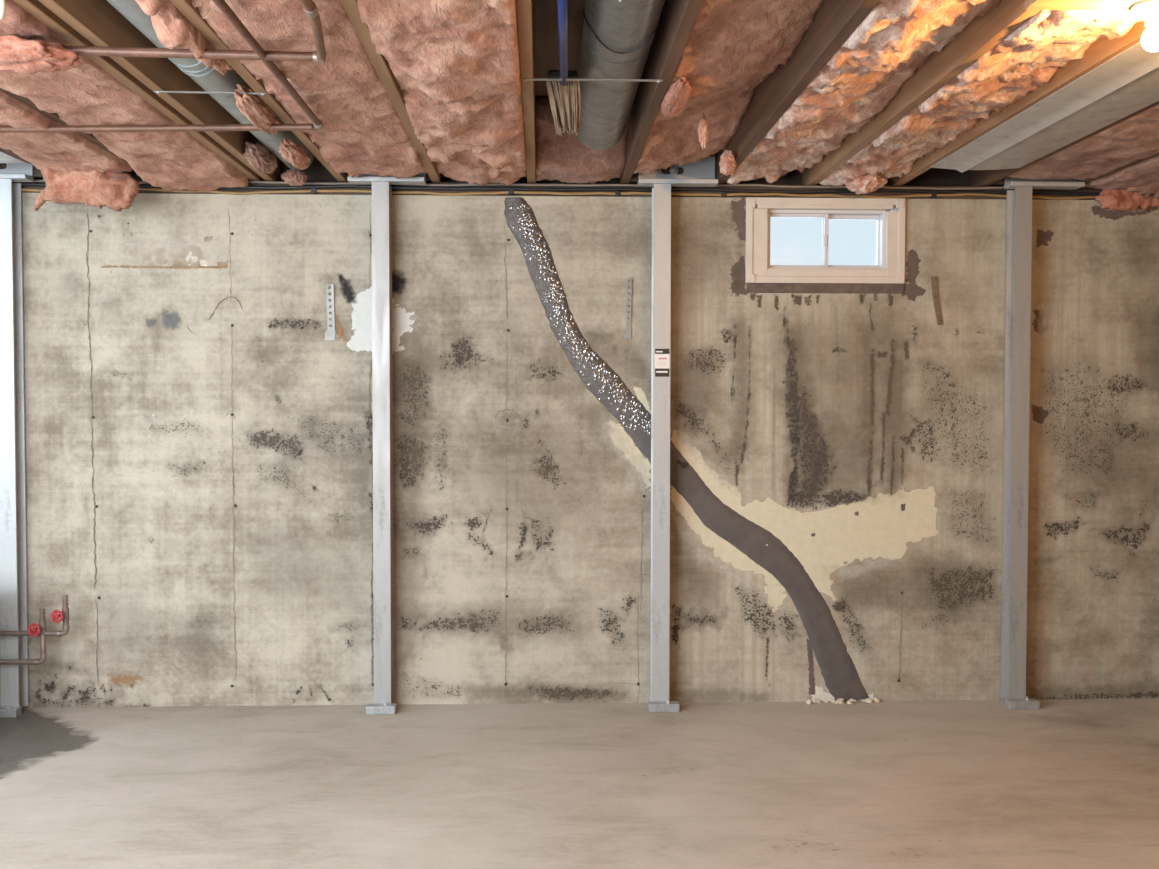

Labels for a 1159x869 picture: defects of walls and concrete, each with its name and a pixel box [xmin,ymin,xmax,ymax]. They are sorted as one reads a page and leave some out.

damp [394,338,493,497]
crack [494,197,869,703]
damp [677,325,751,485]
damp [750,293,917,509]
spalling [899,415,943,484]
damp [1043,360,1149,480]
damp [0,667,114,779]
damp [402,610,499,633]
damp [518,615,574,634]
damp [529,684,618,700]
damp [599,595,636,651]
crack [896,591,904,682]